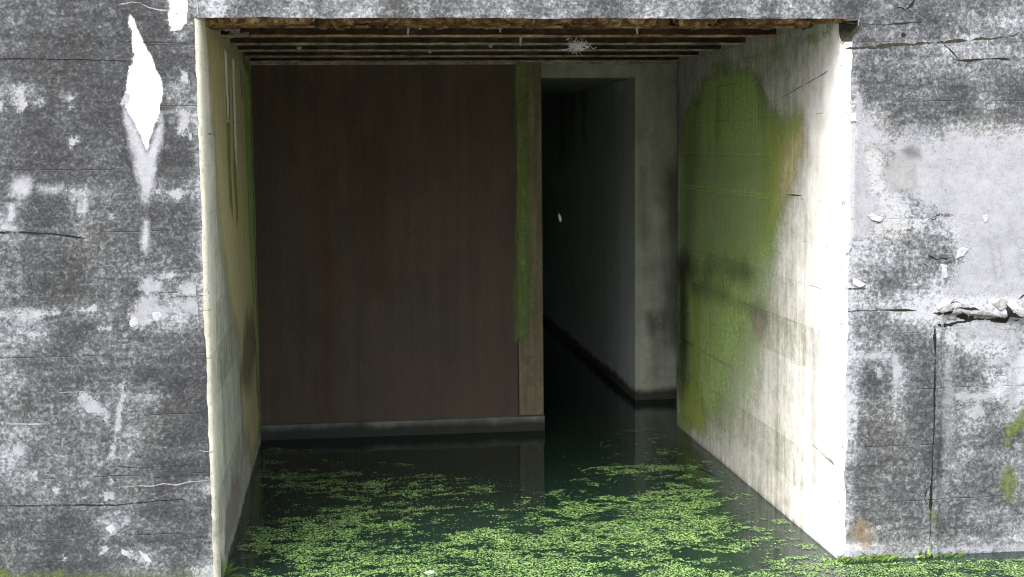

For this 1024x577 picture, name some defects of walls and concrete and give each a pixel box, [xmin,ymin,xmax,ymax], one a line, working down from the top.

crack [845,22,1024,62]
crack [0,231,86,239]
damp [767,121,796,231]
peeling [845,89,1024,328]
crack [924,328,937,557]